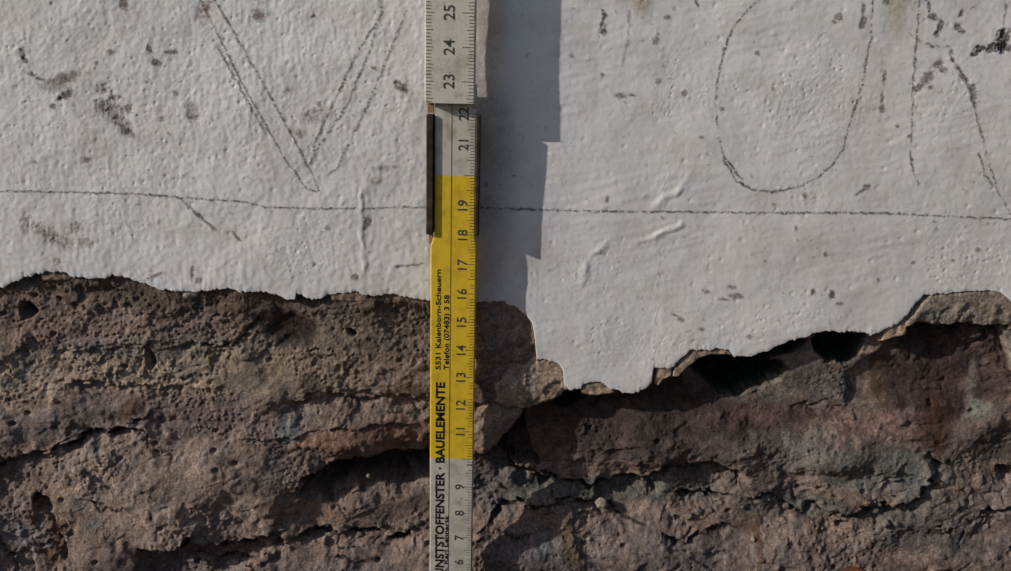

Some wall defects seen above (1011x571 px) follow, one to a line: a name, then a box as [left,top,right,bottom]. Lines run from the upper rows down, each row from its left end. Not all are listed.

crack [54,426,122,449]
spalling [0,270,430,571]
crack [301,525,412,564]
crack [475,437,734,548]
spalling [472,290,1011,571]
crack [673,461,841,518]